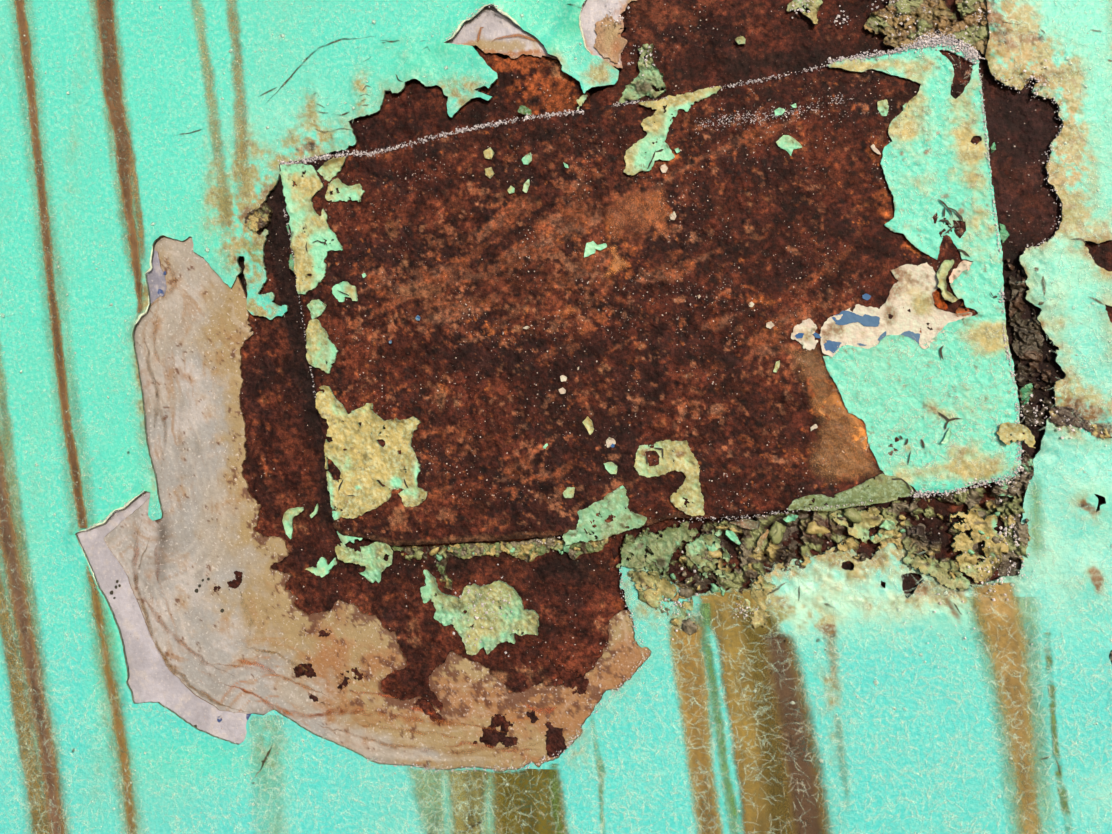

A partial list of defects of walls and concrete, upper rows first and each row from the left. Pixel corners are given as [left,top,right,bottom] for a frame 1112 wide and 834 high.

rust [15,0,87,528]
rust [91,0,144,313]
rust [195,0,247,218]
peeling [445,4,558,59]
peeling [579,0,722,176]
peeling [936,259,972,303]
rust [0,372,65,834]
rust [87,566,136,834]
peeling [76,156,652,771]
peeling [634,440,705,516]
rust [240,0,1112,834]
peeling [788,474,915,511]